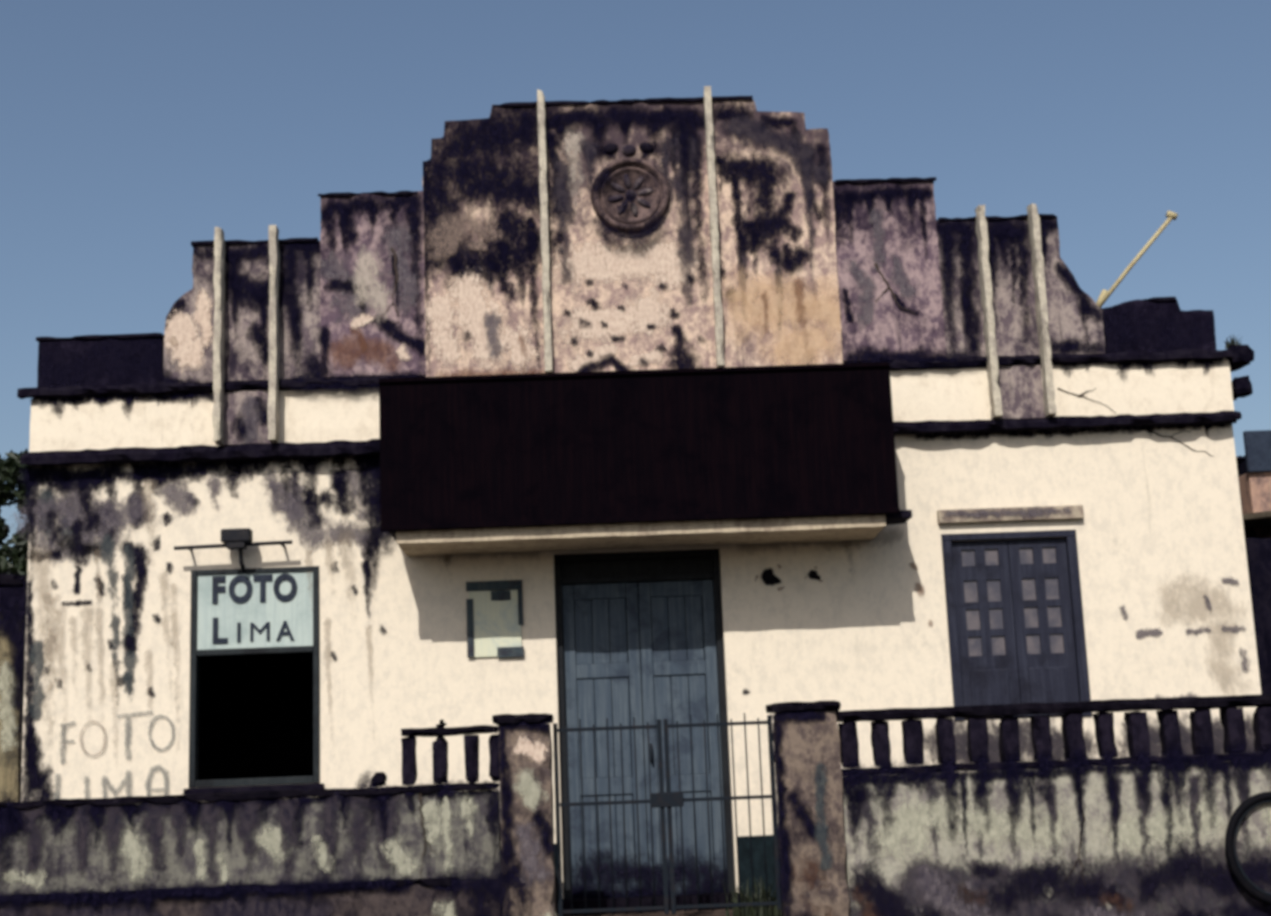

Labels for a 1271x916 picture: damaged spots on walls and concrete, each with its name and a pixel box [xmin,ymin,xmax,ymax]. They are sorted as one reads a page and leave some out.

water stain [193,102,1223,392]
water stain [233,396,268,443]
water stain [15,455,394,694]
water stain [1136,629,1162,639]
water stain [1186,626,1245,635]
water stain [0,580,554,916]
water stain [572,850,728,899]
water stain [770,710,832,916]
water stain [842,716,1271,916]